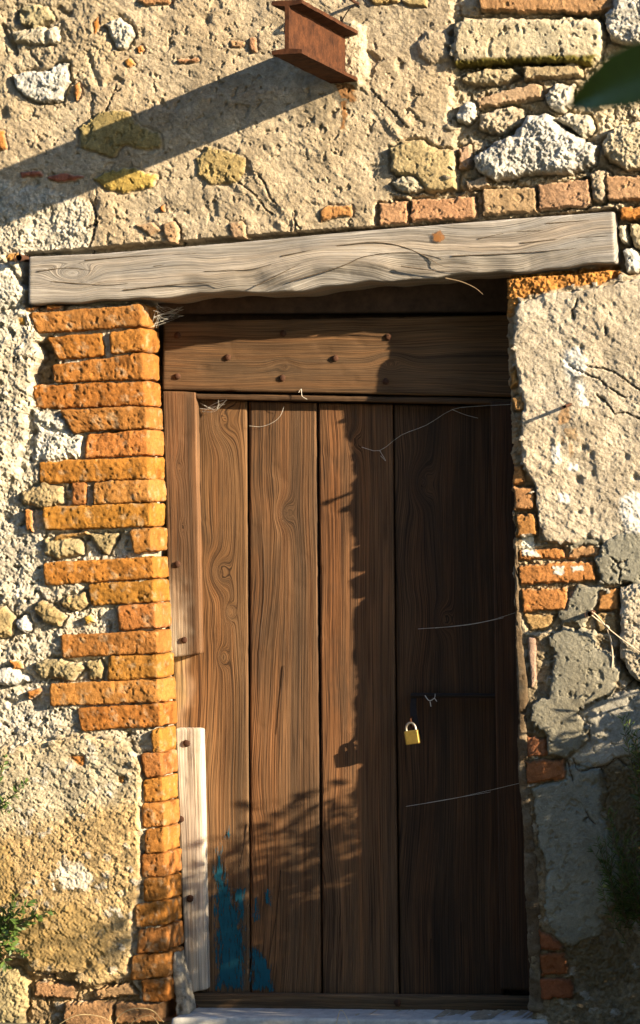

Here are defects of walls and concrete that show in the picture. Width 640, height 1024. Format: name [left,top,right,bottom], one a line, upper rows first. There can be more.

spalling [393,0,640,635]
crack [574,367,640,419]